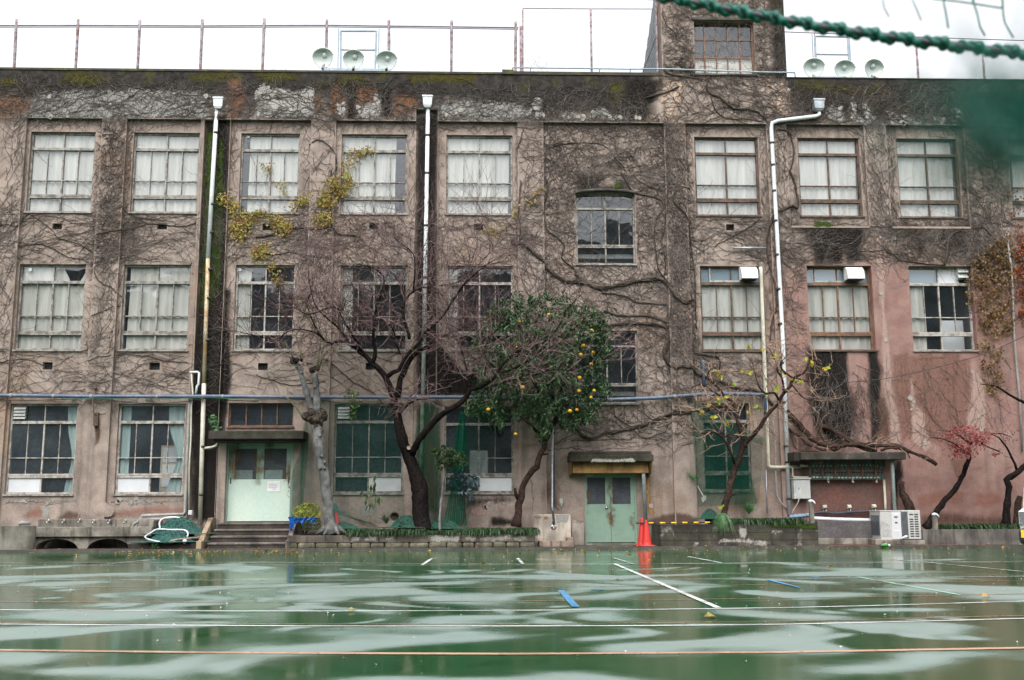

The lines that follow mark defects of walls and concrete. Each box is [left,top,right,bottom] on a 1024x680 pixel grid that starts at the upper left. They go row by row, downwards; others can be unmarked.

flaking render [254,83,318,118]
flaking render [336,93,381,118]
damp [805,228,865,264]
damp [806,350,855,444]